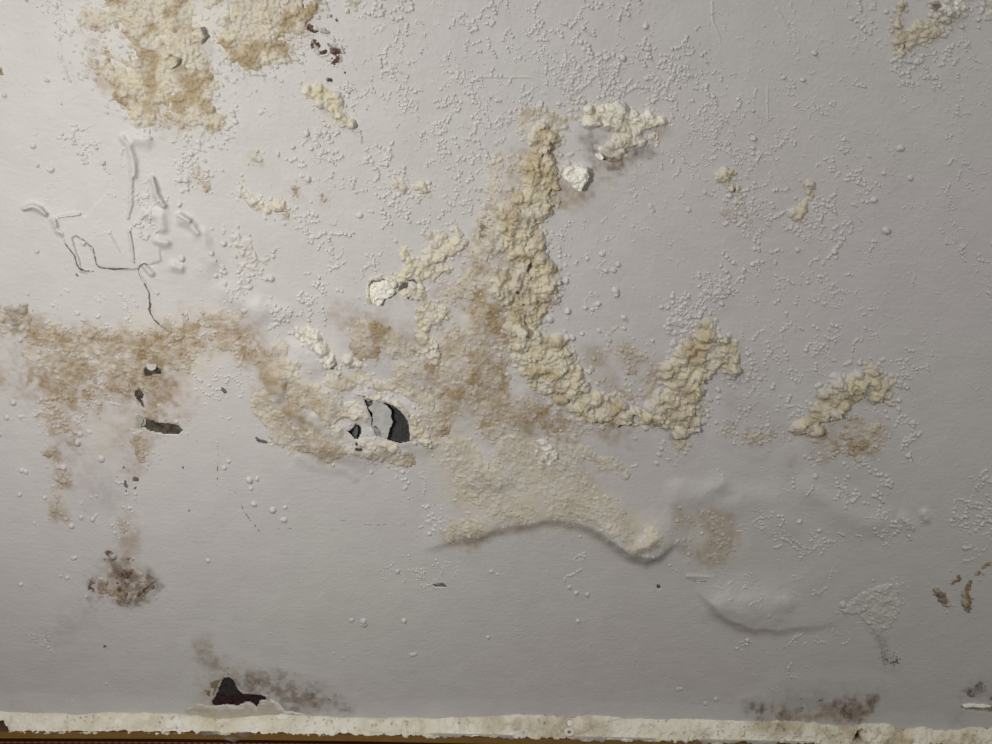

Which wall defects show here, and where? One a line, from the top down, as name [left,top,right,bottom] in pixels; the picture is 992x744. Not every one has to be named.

peeling [52,0,362,164]
crack [62,236,173,334]
leakage [0,154,513,534]
peeling [15,87,910,560]
leakage [393,320,906,578]
peeling [0,675,992,734]